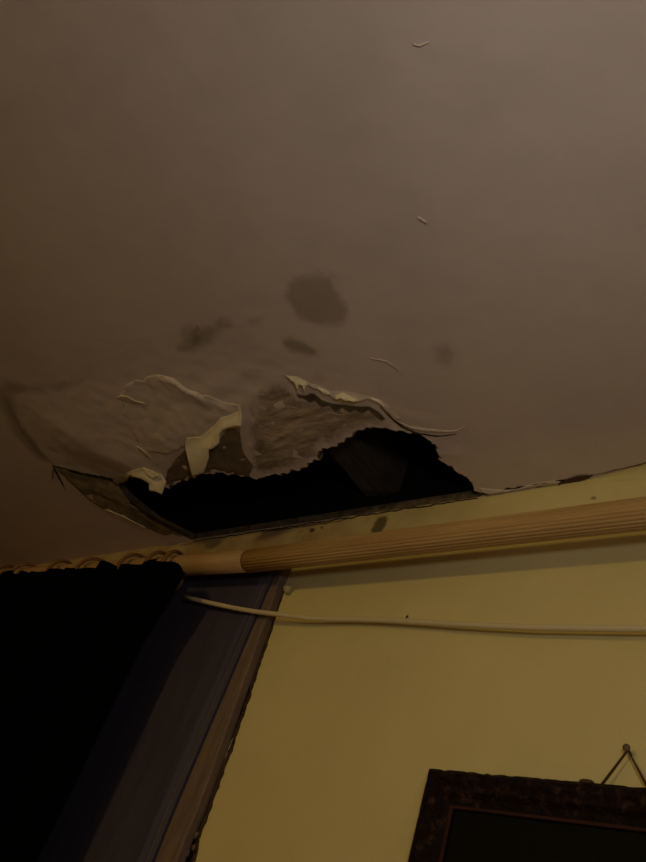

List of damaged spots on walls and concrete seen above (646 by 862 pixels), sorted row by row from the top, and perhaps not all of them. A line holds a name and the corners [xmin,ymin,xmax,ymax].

peeling [117,374,464,495]